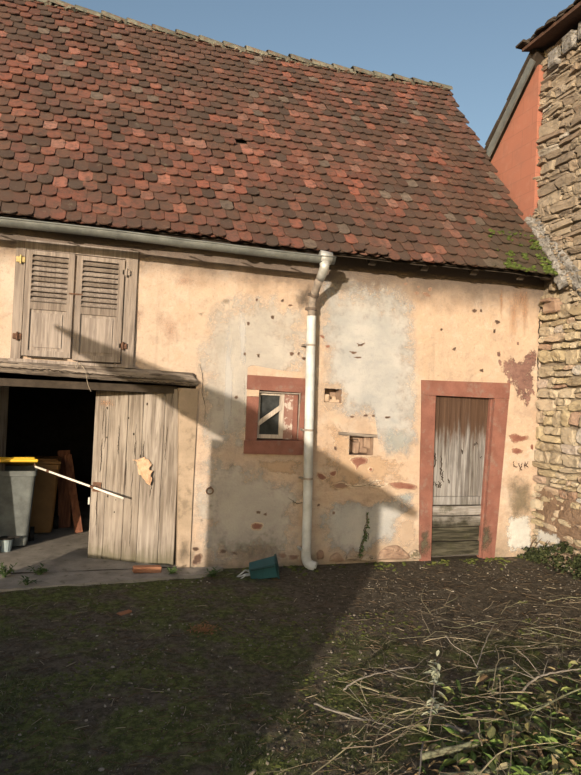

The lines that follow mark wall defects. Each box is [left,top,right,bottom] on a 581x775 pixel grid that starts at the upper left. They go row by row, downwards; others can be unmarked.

peeling [319,285,417,449]
peeling [316,426,421,562]
flaking render [497,350,537,406]
flaking render [509,434,533,455]